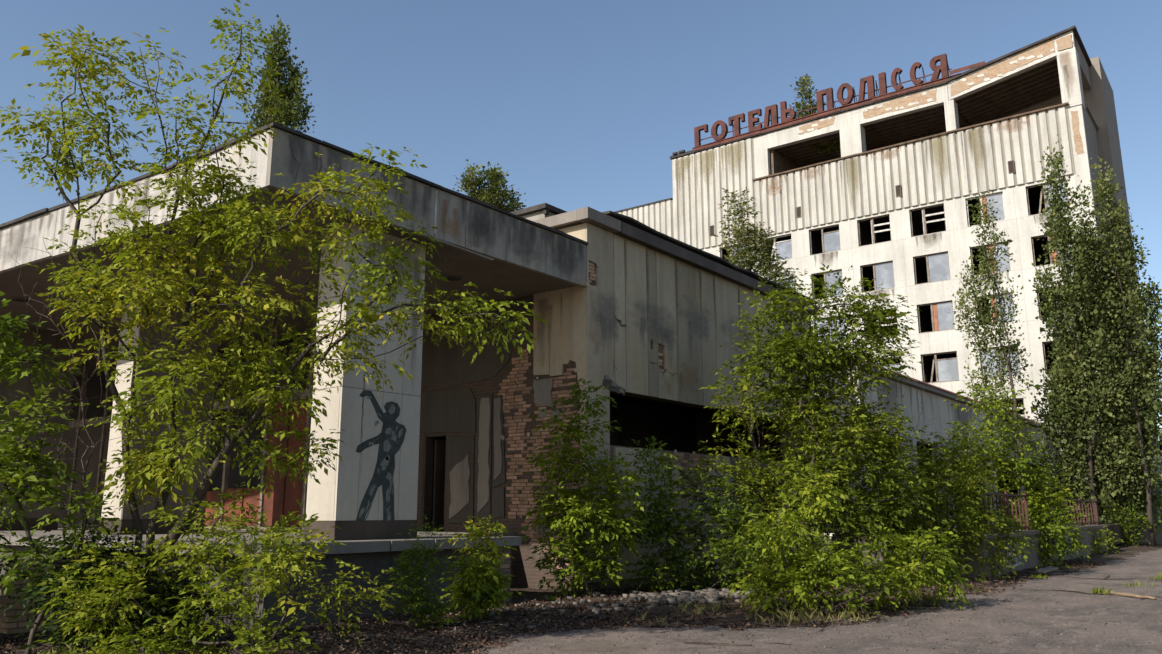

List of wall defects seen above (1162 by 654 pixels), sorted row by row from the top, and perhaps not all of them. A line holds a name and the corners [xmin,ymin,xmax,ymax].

spalling [949,34,1073,86]
spalling [498,334,583,570]